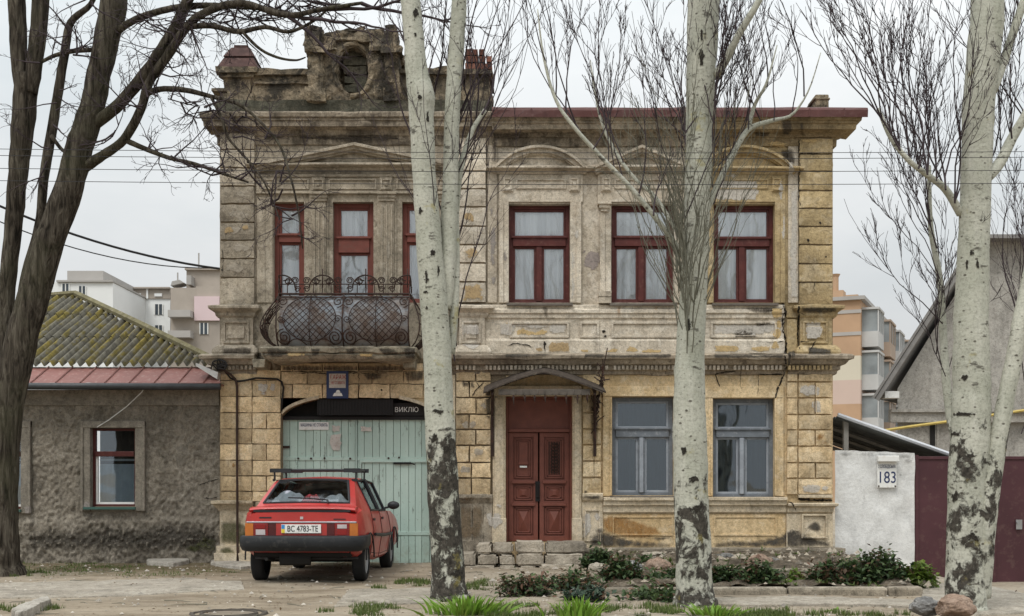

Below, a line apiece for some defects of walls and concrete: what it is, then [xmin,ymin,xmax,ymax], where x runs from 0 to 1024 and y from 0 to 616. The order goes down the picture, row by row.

peeling [500,322,588,352]
crack [715,303,816,398]
water stain [591,529,666,546]